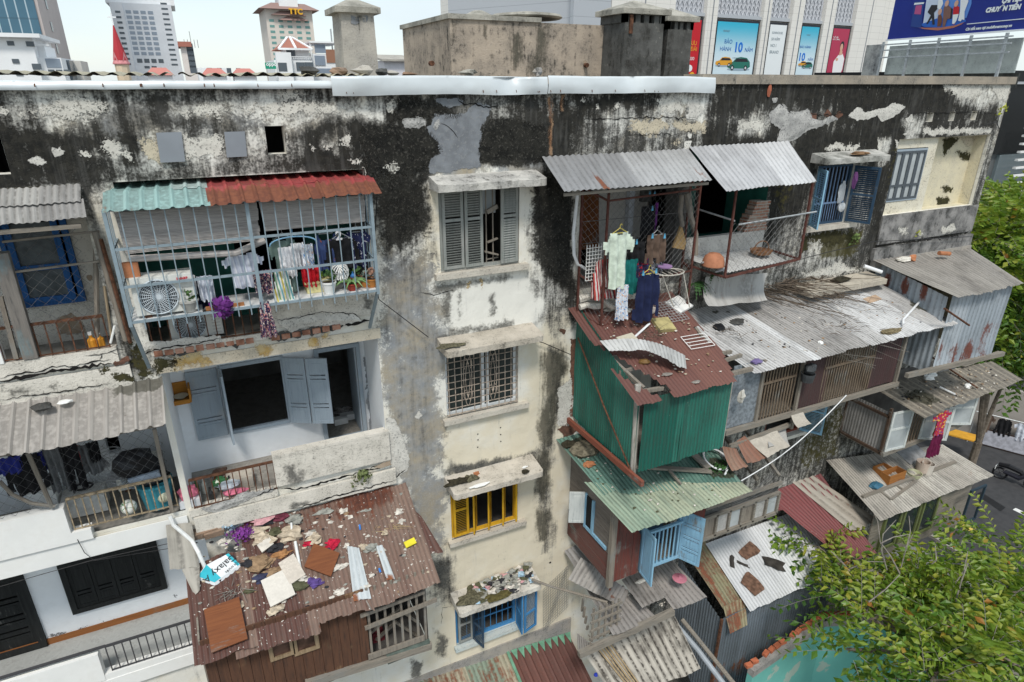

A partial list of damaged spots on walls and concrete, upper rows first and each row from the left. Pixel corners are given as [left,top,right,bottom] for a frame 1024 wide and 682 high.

water stain [359,99,461,255]
water stain [478,116,576,292]
spalling [737,98,993,152]
crack [0,338,219,400]
water stain [535,349,568,541]